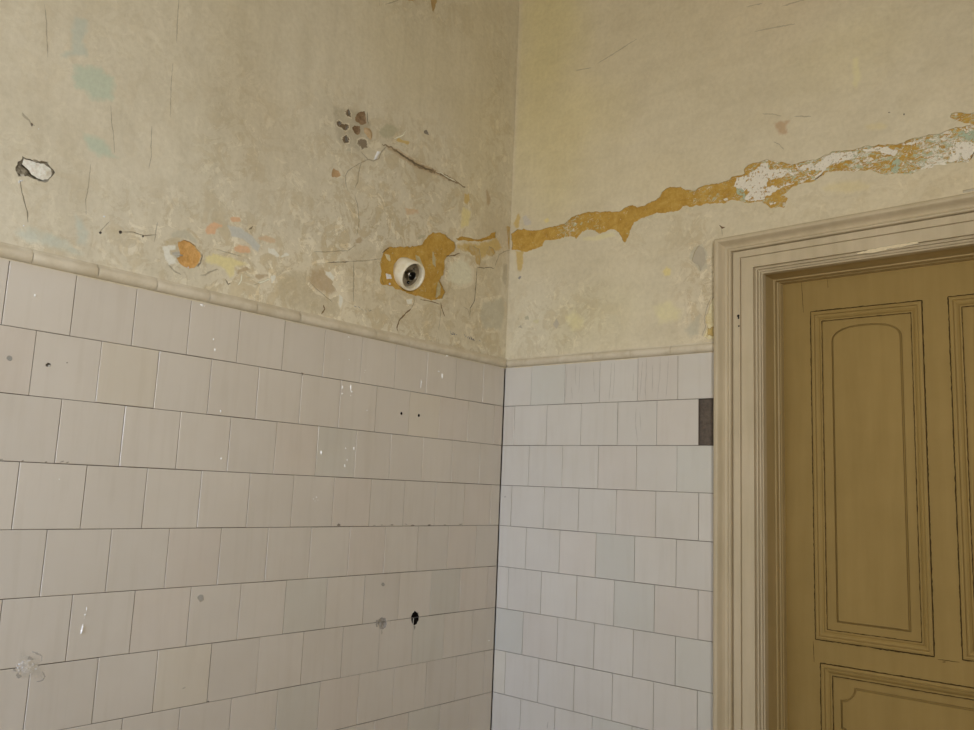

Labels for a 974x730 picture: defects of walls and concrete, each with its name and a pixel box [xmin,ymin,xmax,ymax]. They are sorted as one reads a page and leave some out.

flaking render [327,102,381,160]
flaking render [15,156,55,226]
crack [382,142,465,188]
peeling [380,112,974,301]
flaking render [161,240,203,268]
peeling [698,398,714,445]